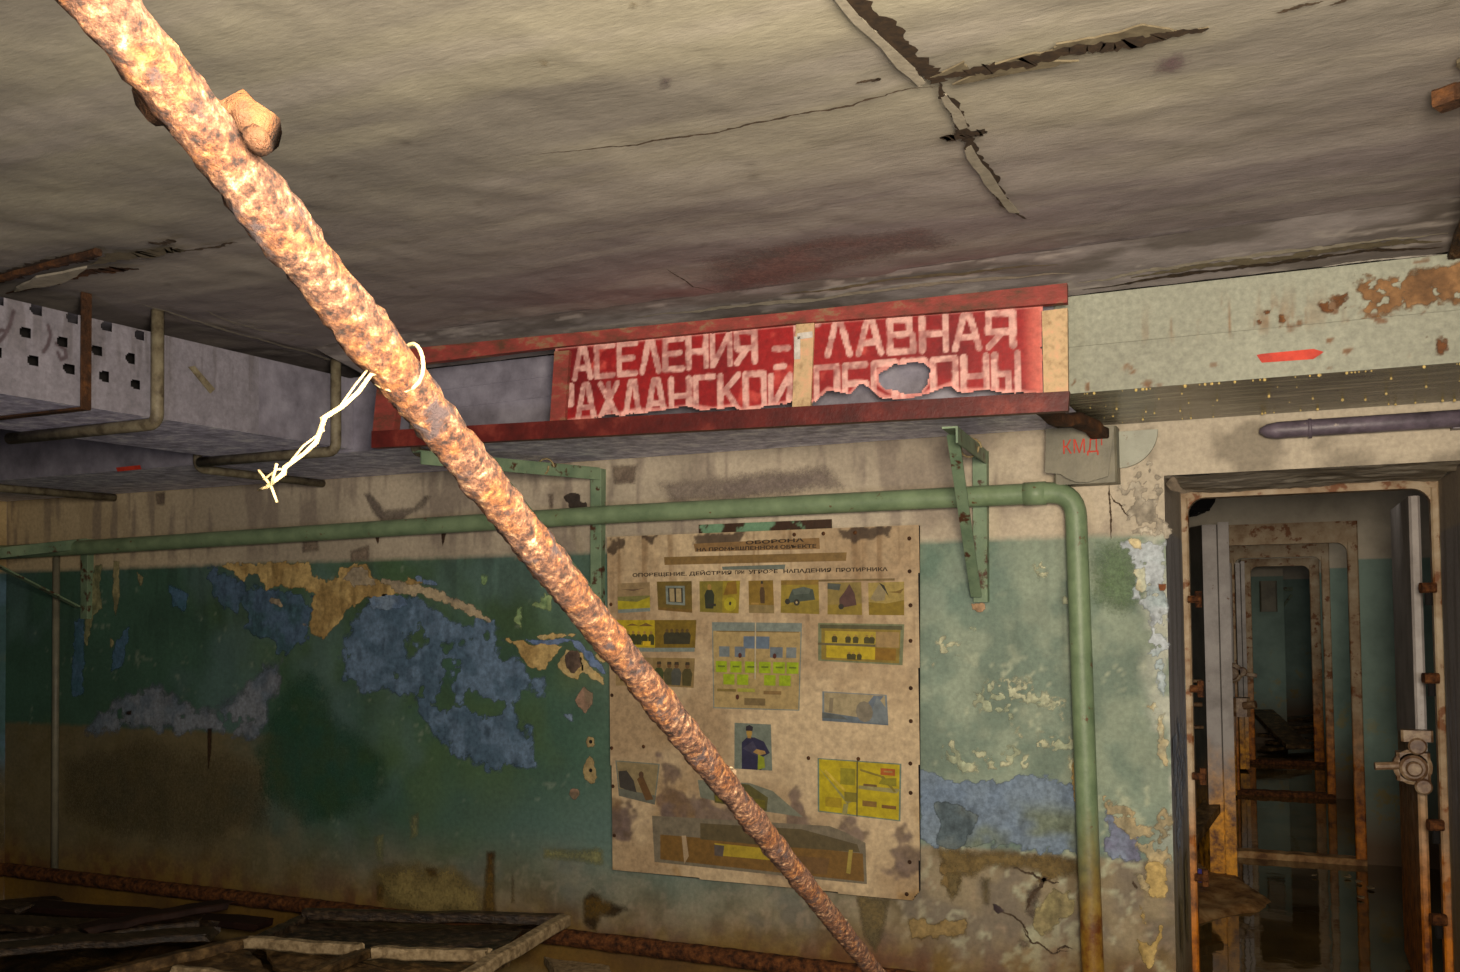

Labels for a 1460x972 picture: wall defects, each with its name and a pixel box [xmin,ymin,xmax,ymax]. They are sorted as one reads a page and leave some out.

crack [536,0,1209,219]
crack [0,239,330,360]
peeling [71,561,130,697]
peeling [85,560,605,773]
spalling [569,737,597,800]
peeling [1103,461,1189,969]
crack [993,867,1072,954]